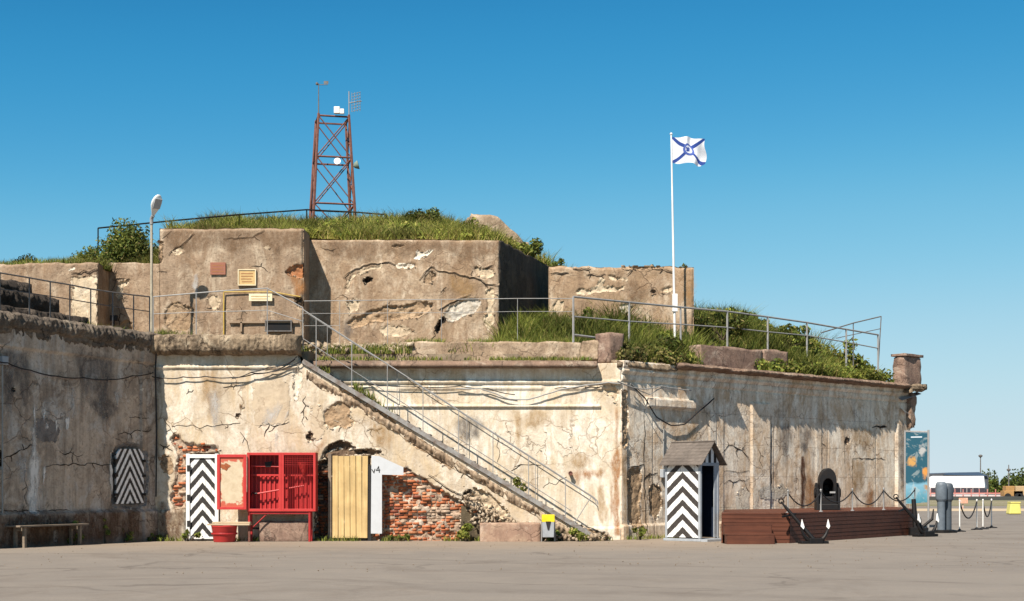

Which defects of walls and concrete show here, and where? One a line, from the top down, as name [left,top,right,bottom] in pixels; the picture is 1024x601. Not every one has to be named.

spalling [285,264,303,279]
crack [343,260,499,337]
spalling [345,263,498,338]
spalling [576,265,663,296]
crack [118,382,384,461]
flaking render [110,432,221,510]
flaking render [311,386,455,540]
flaking render [372,466,510,541]
crack [722,424,772,509]